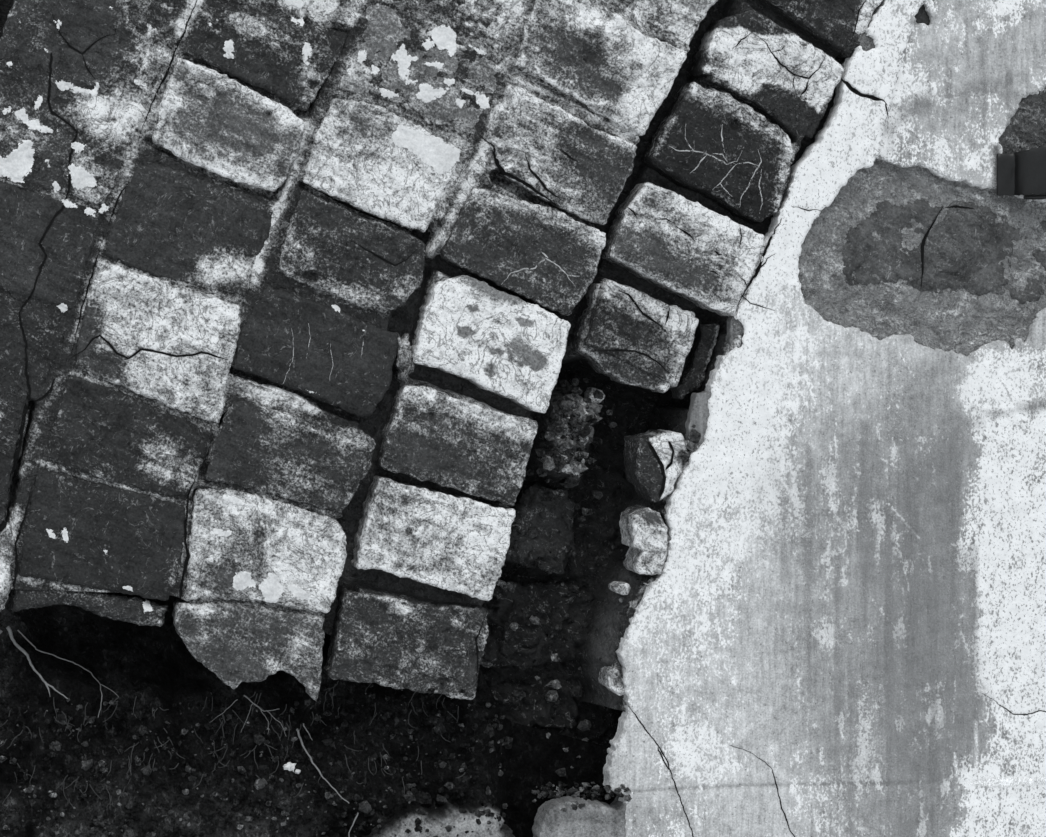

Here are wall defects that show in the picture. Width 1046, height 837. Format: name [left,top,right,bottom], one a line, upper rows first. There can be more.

spalling [999,86,1046,154]
spalling [798,159,1046,356]
crack [0,0,227,600]
spalling [524,374,617,522]
spalling [673,388,712,461]
spalling [505,608,539,631]
spalling [511,667,583,719]
spalling [577,719,597,741]
crack [982,693,1046,715]
crack [630,708,694,837]
crack [730,745,795,837]